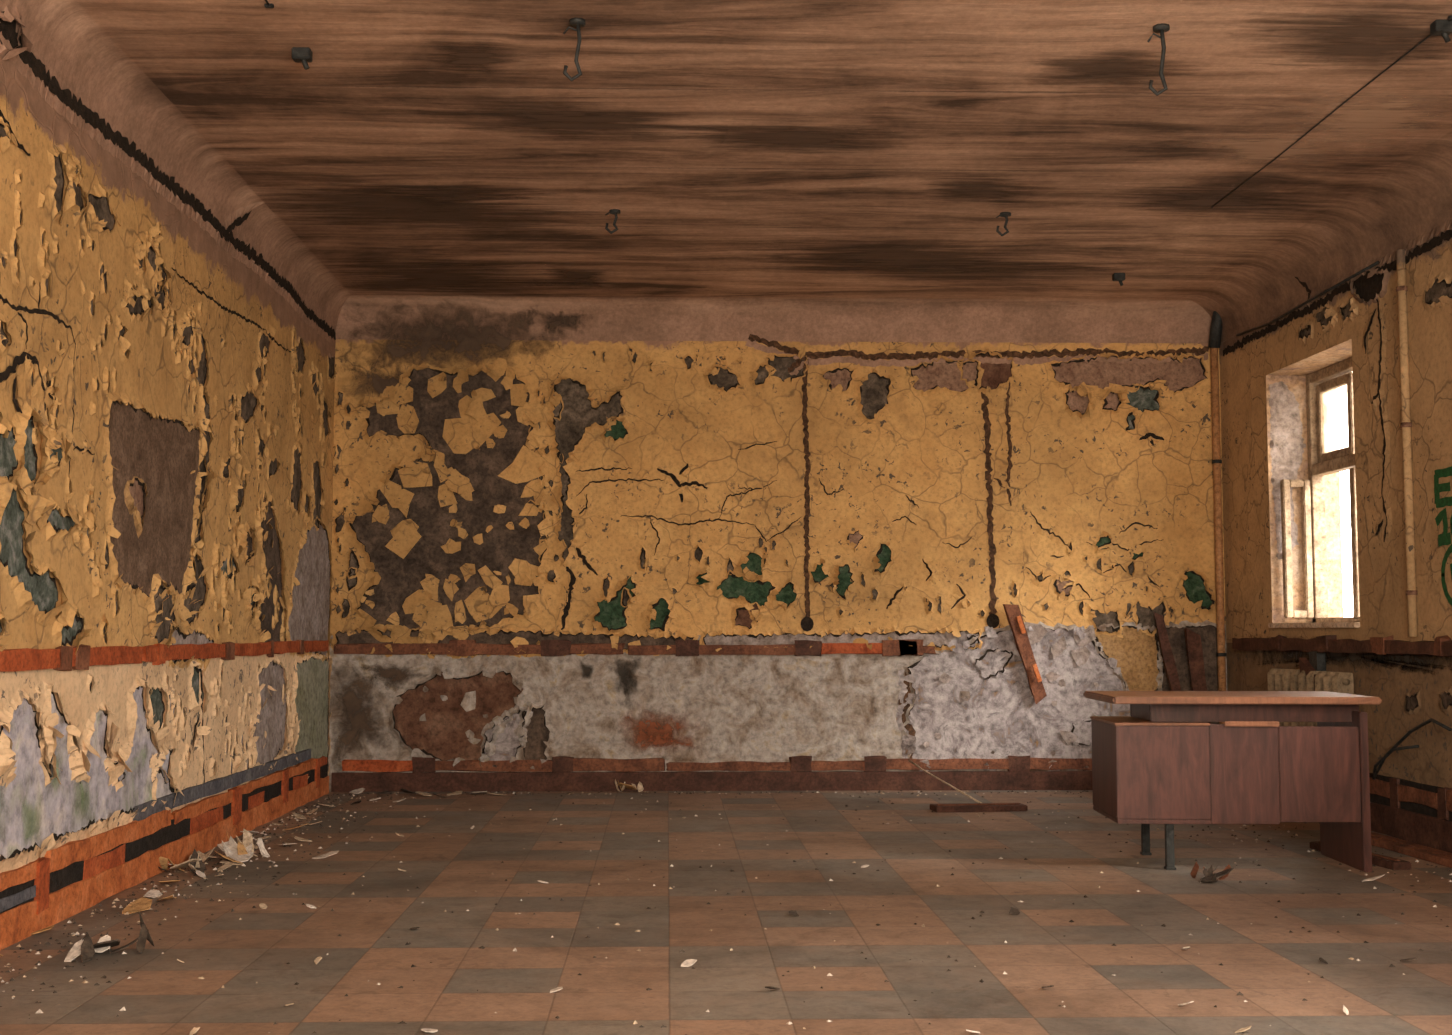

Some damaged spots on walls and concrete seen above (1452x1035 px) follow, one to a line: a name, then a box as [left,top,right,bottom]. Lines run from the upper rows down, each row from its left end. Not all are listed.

peeling [0,120,18,153]
crack [0,281,95,509]
peeling [0,144,1227,870]
crack [745,219,1452,612]